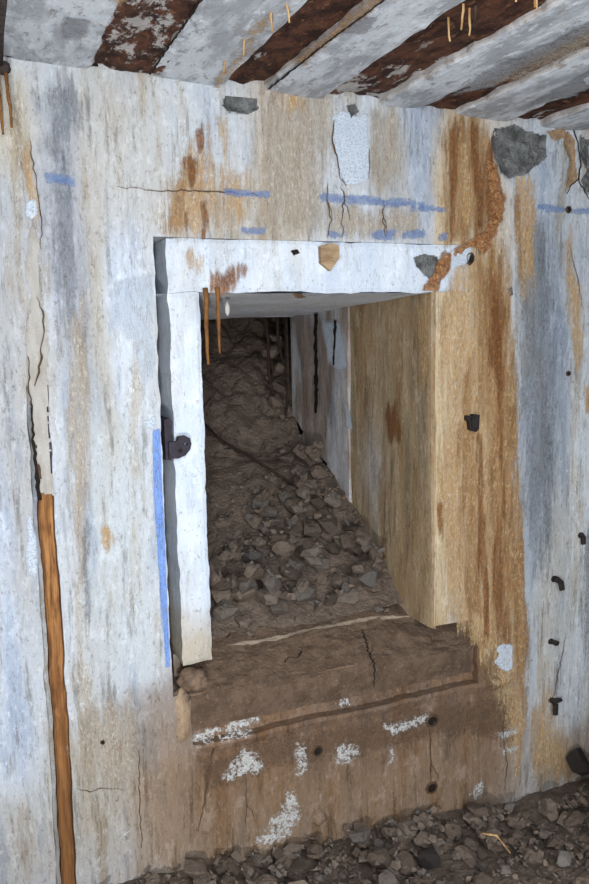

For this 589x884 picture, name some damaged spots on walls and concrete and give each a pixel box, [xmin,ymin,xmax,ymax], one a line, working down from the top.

peeling [340,17,377,35]
peeling [529,71,589,107]
crack [117,186,270,197]
corrosion [167,119,251,239]
crack [326,122,350,237]
spalling [414,124,589,291]
corrosion [203,266,246,365]
crack [28,298,45,501]
corrosion [385,401,401,442]
corrosion [418,117,569,779]
damp [193,696,518,784]
efflorescence [256,791,301,845]